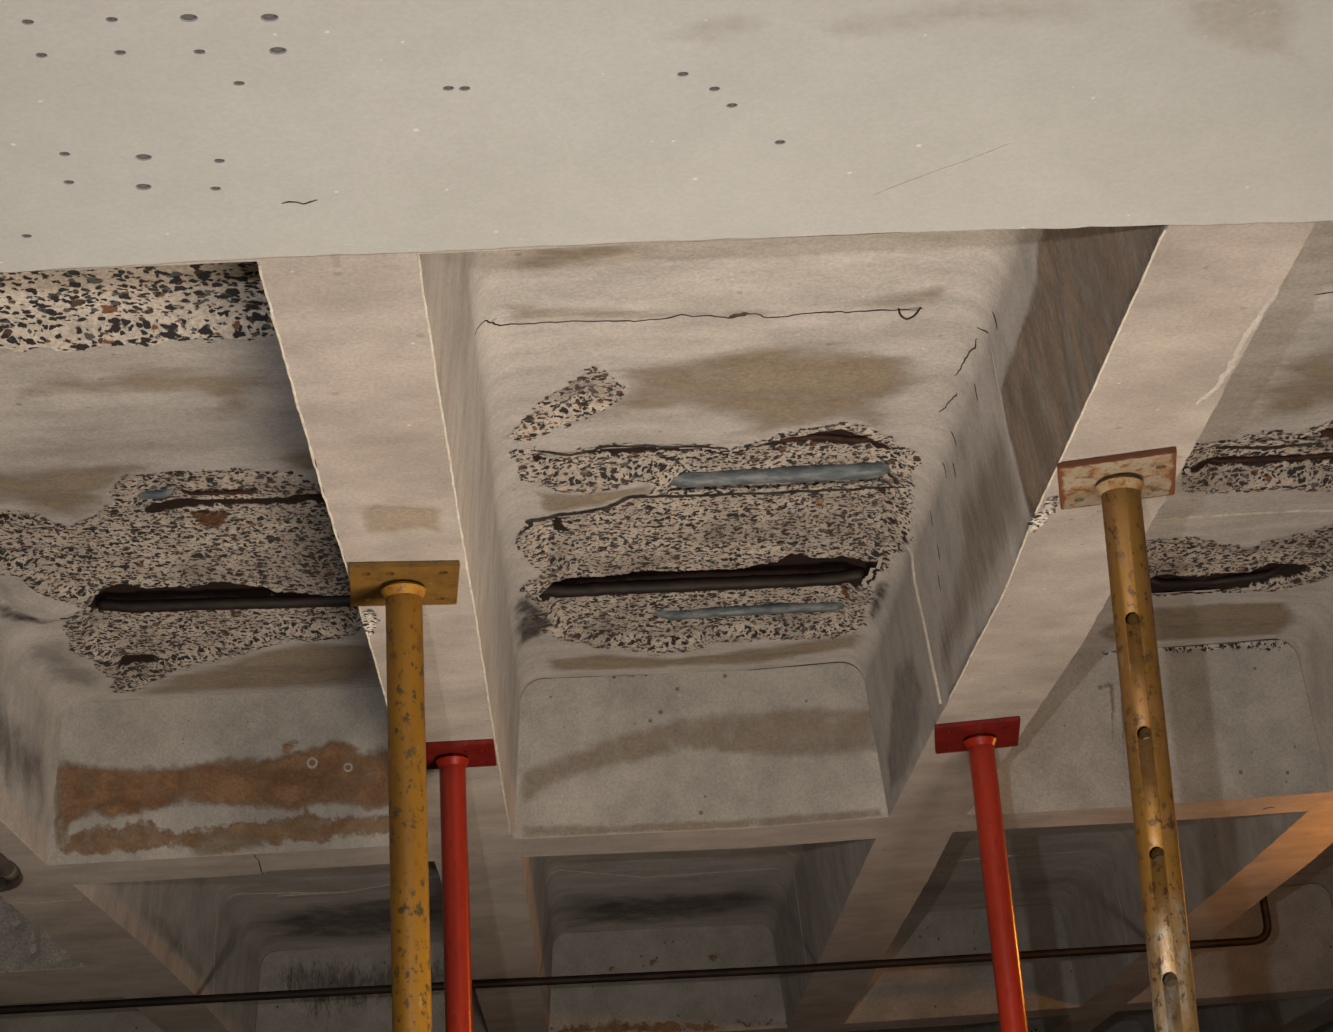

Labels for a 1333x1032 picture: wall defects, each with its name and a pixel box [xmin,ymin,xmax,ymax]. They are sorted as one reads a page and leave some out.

spalling [0,262,276,352]
crack [475,308,924,334]
damp [627,351,902,425]
spalling [1181,421,1333,495]
spalling [508,367,921,656]
spalling [0,468,380,693]
spalling [1146,525,1333,597]
rust [57,742,389,855]